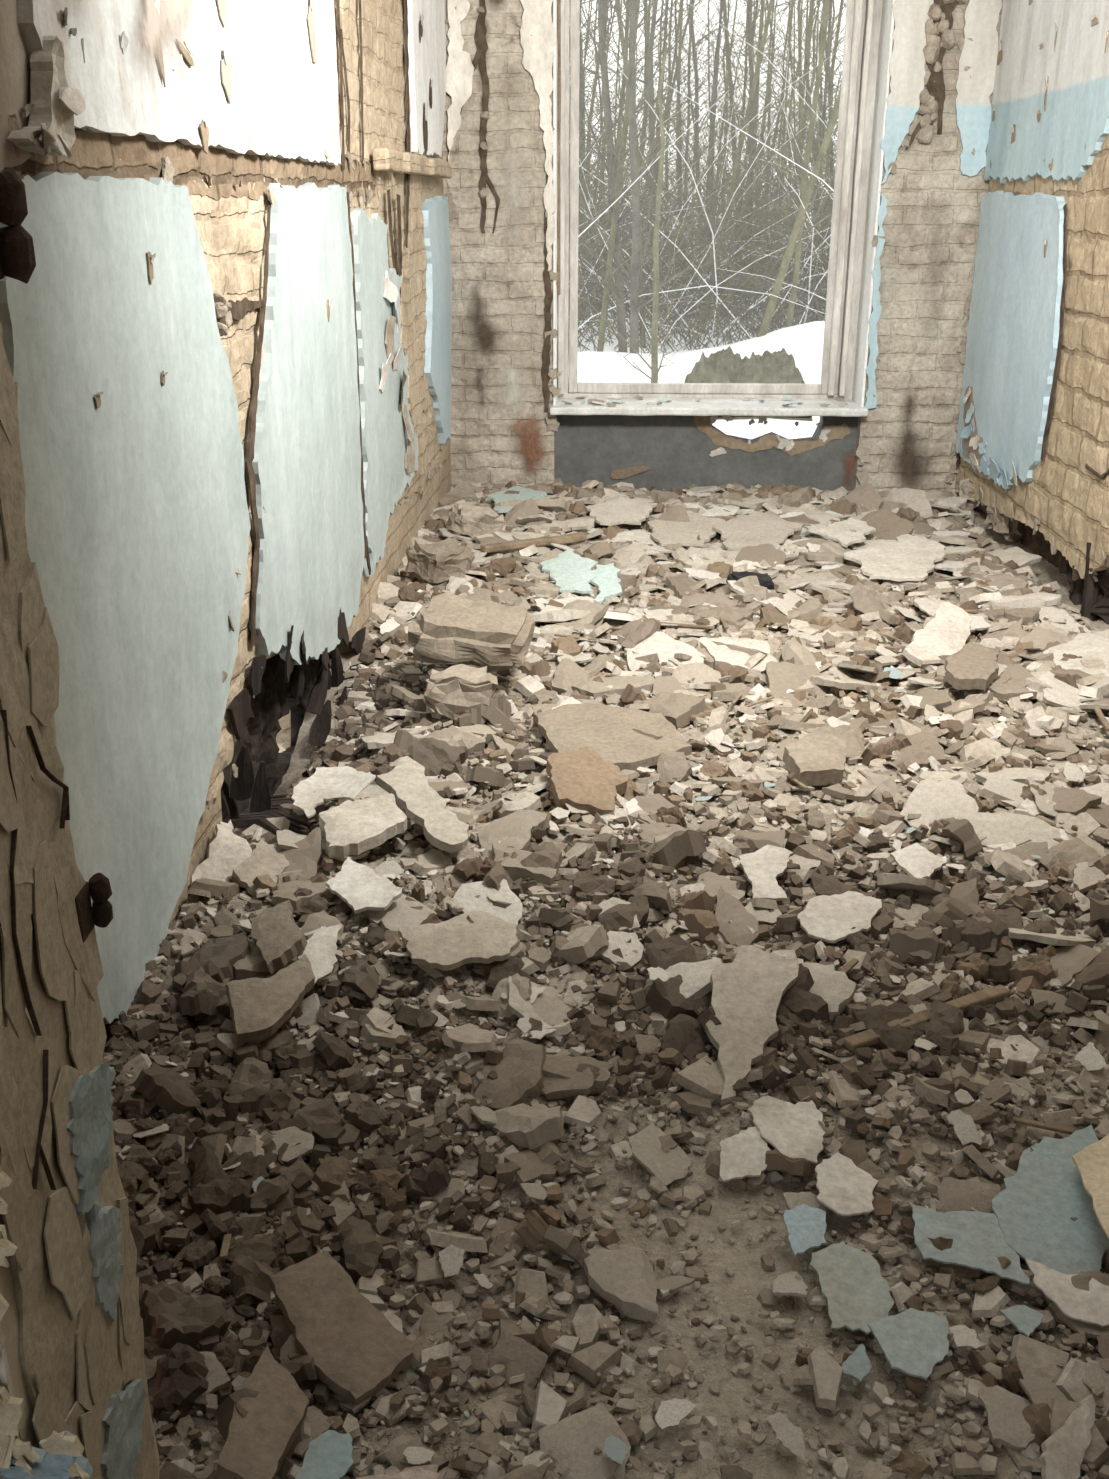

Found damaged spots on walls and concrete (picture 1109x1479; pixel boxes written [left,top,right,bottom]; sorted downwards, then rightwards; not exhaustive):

crack [460,0,500,233]
crack [905,0,967,149]
peeling [1090,15,1109,53]
spalling [0,0,564,809]
peeling [710,416,831,451]
spalling [856,37,1109,582]
peeling [0,321,158,1479]
peeling [295,1430,354,1479]